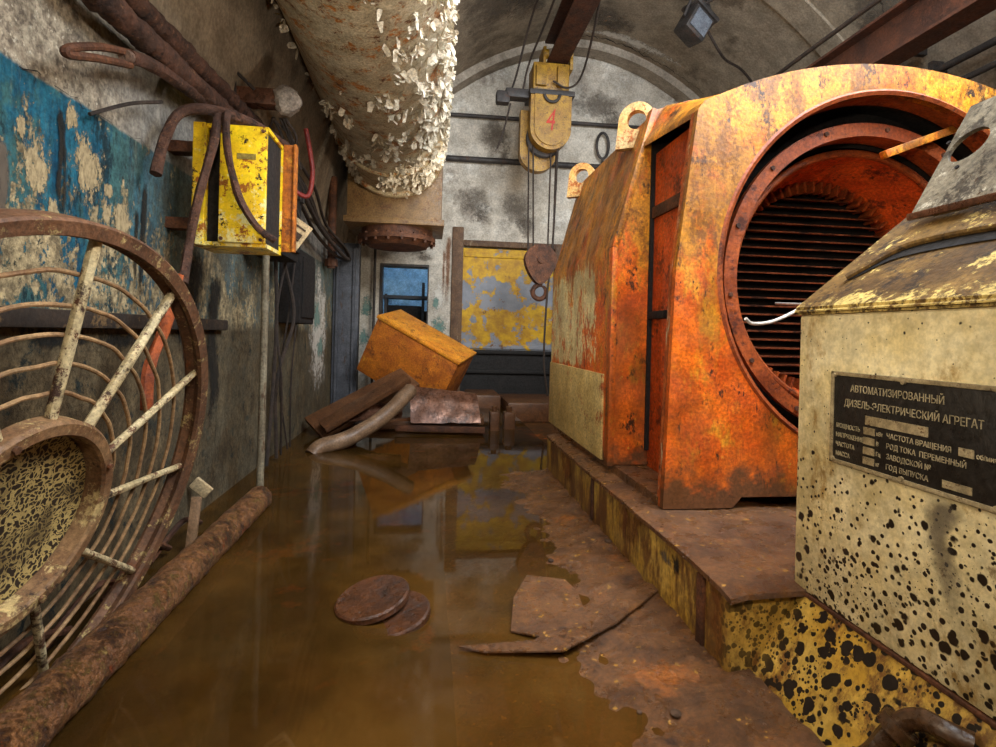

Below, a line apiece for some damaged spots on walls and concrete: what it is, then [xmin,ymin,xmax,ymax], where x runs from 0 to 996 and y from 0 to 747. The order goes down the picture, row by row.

peeling [13,115,59,213]
peeling [66,100,133,234]
damp [459,191,488,222]
damp [504,195,532,234]